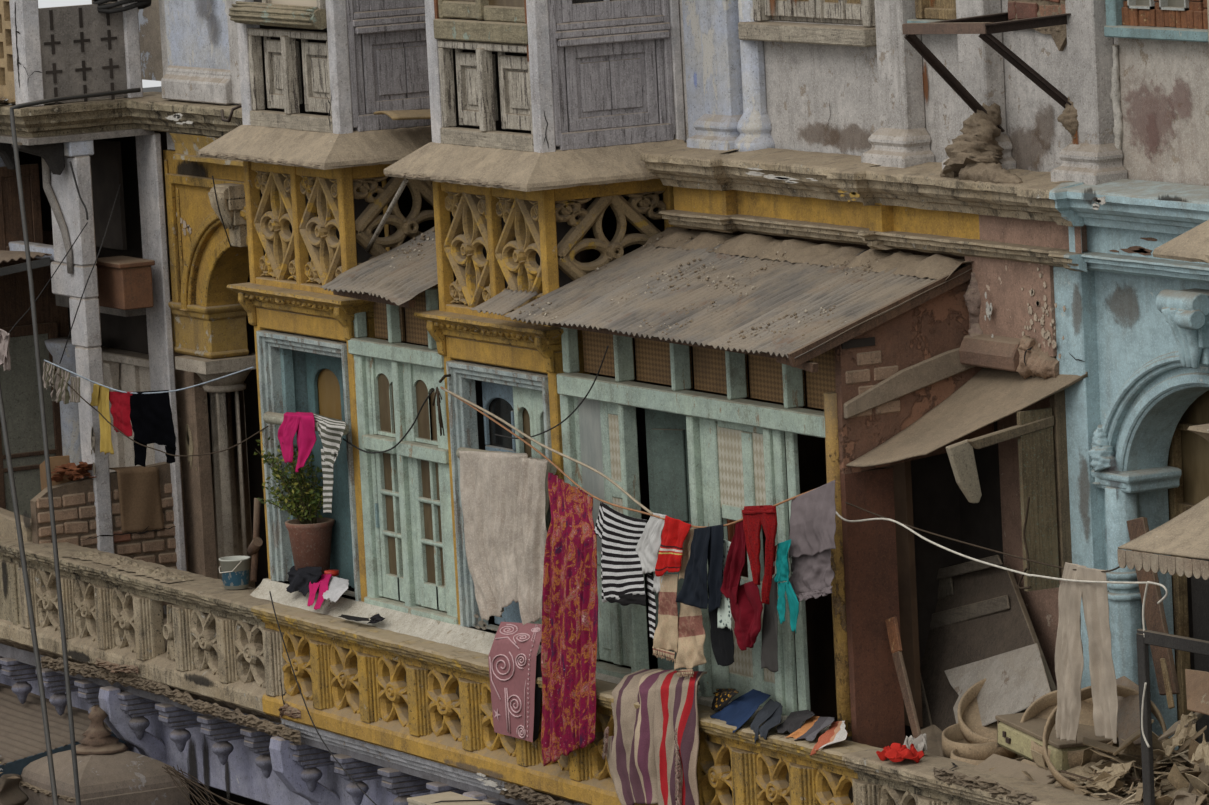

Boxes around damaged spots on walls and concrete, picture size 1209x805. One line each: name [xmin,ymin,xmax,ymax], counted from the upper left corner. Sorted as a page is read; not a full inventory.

peeling [984,292,994,338]
spalling [1016,267,1066,379]